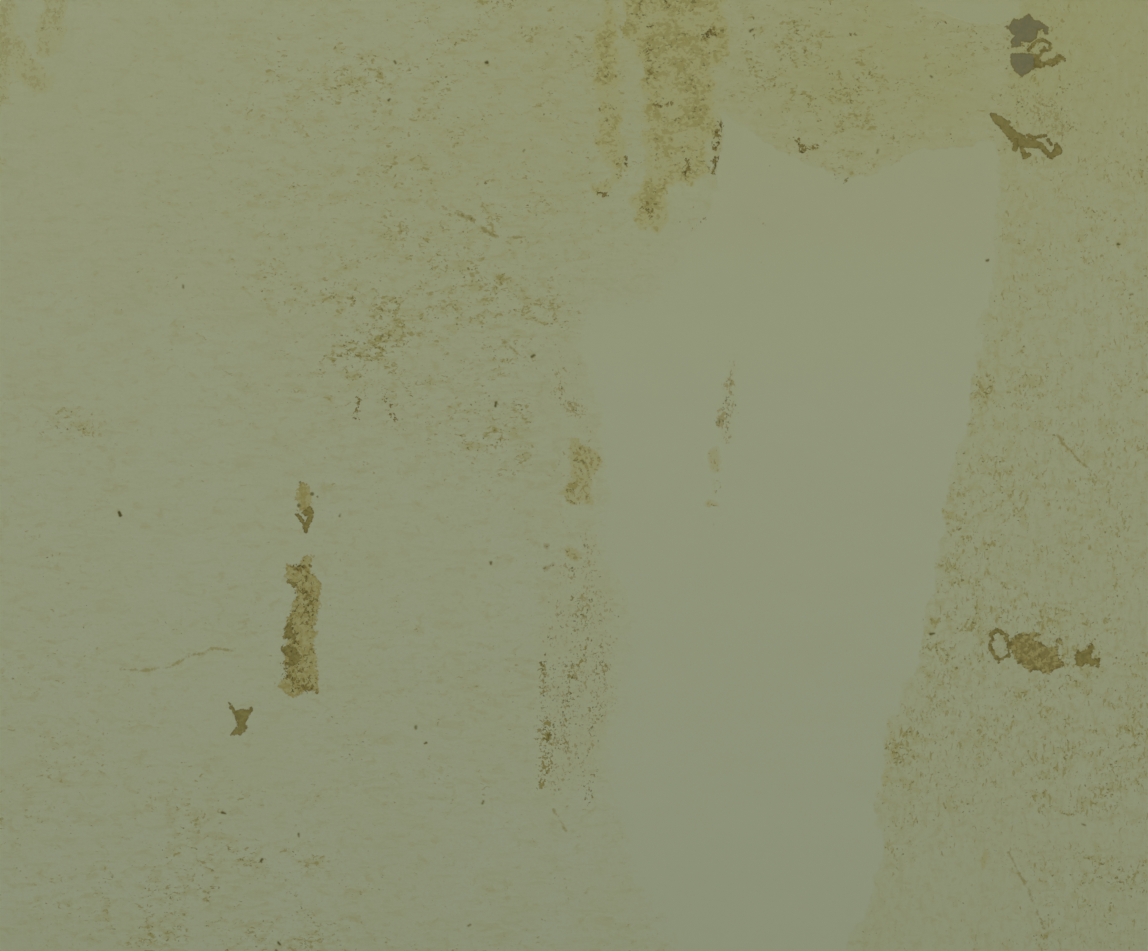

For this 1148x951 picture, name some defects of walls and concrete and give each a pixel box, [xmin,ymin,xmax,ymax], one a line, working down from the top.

water stain [0,0,77,195]
water stain [581,0,739,242]
flaking render [986,12,1096,166]
flaking render [292,477,318,533]
flaking render [225,698,256,738]
flaking render [271,549,325,701]
flaking render [988,625,1101,678]